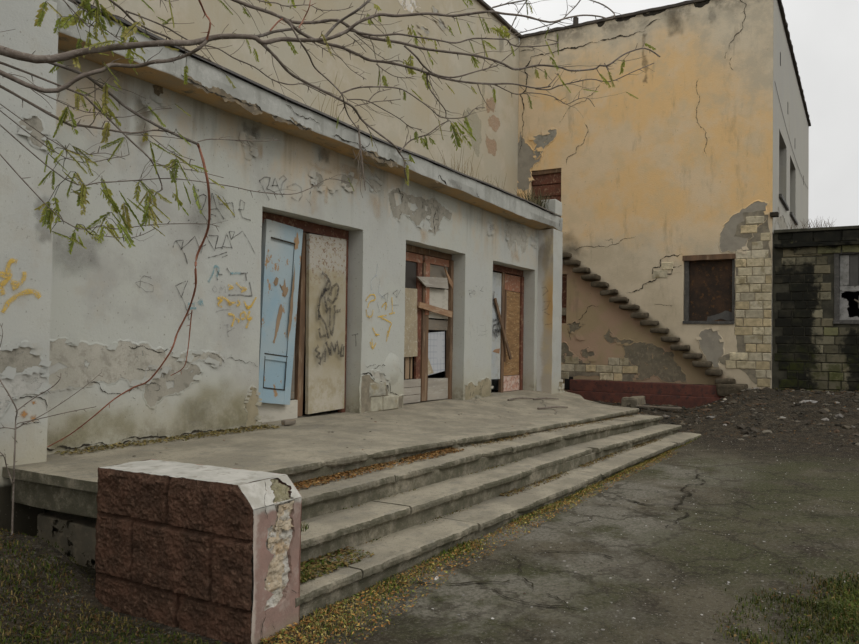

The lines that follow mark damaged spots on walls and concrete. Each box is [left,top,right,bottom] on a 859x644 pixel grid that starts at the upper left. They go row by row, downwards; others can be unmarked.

spalling [183,75,312,130]
crack [520,18,663,149]
flaking render [517,127,558,194]
flaking render [308,169,453,236]
flaking render [718,200,788,254]
crack [629,254,682,306]
flaking render [0,337,224,419]
flaking render [603,327,687,384]
flaking render [696,327,725,368]
spalling [264,479,294,611]